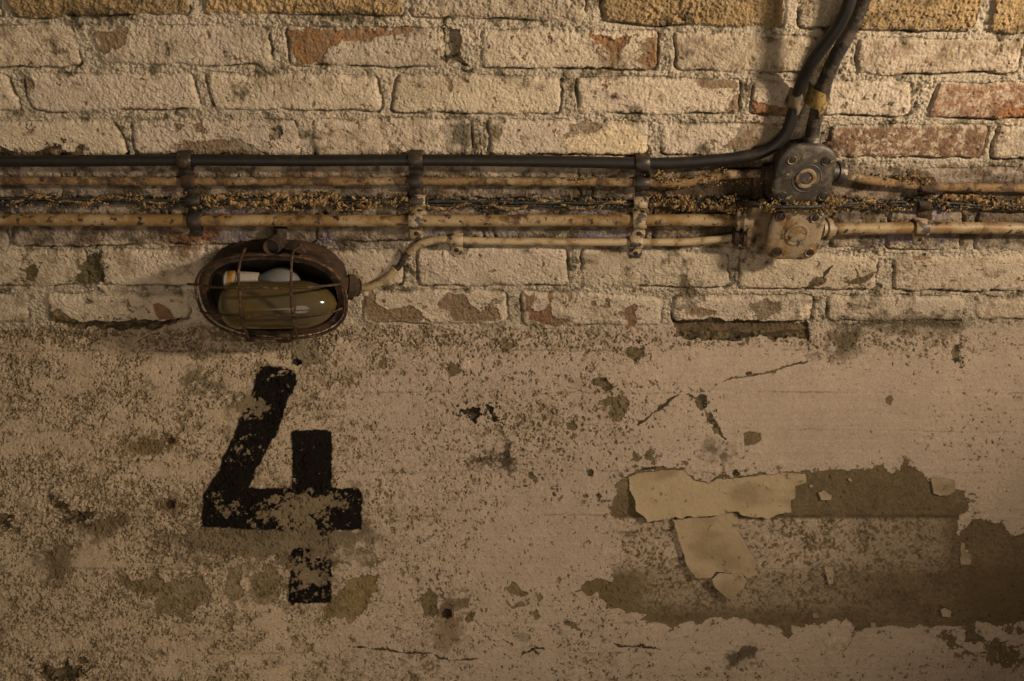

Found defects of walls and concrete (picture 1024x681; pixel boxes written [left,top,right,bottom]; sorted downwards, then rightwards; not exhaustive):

peeling [280,19,420,73]
peeling [363,289,504,328]
peeling [520,285,652,364]
spalling [671,294,830,363]
spalling [455,401,506,425]
crack [637,361,810,440]
peeling [572,442,1024,673]